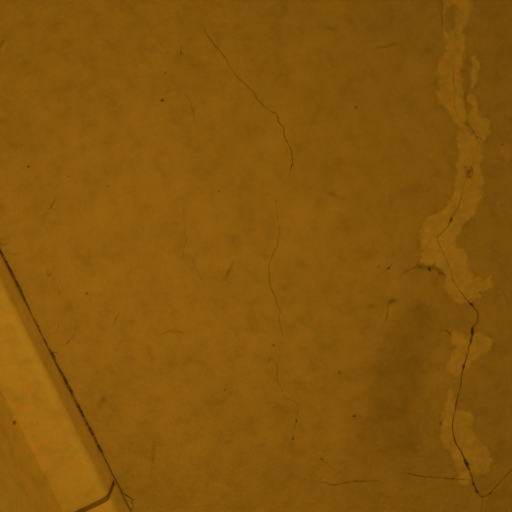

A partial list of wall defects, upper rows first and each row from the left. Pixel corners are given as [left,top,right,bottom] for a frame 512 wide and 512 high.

crack [0,249,132,511]
crack [452,294,493,497]